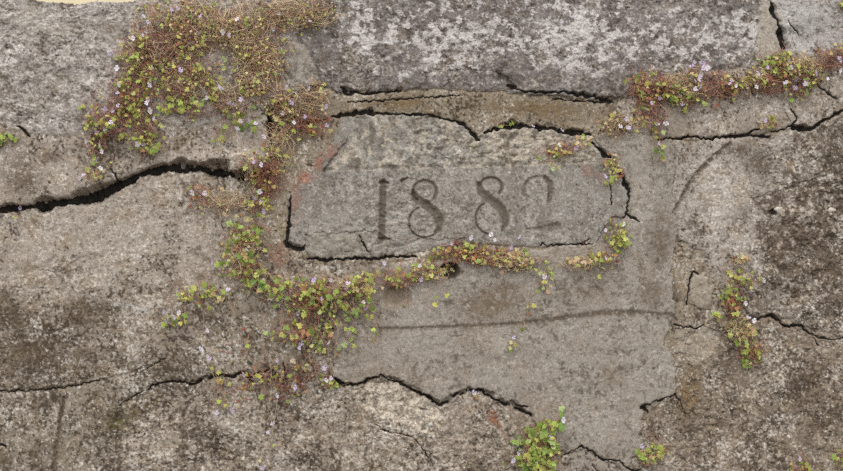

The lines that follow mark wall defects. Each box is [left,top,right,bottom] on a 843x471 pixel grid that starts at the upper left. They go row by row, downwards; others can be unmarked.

crack [769,1,799,49]
crack [657,70,843,141]
crack [0,163,247,213]
crack [756,313,843,346]
crack [334,374,532,416]
crack [640,393,685,414]
crack [375,424,434,469]
crack [564,445,640,471]